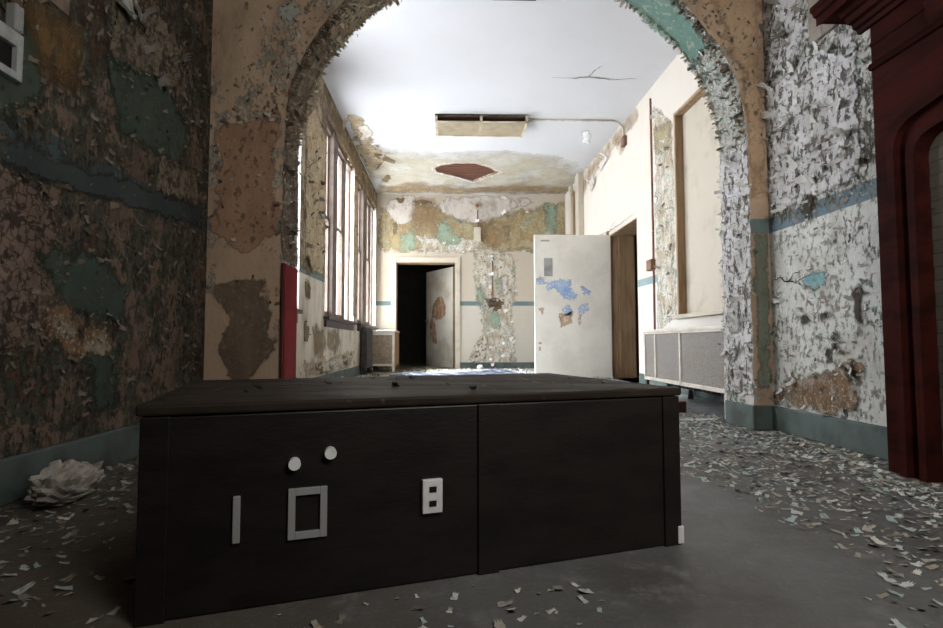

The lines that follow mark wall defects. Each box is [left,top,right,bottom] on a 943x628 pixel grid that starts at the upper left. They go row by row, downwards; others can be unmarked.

peeling [386,194,518,366]
water stain [339,118,628,253]
peeling [536,277,591,328]
peeling [614,0,875,418]